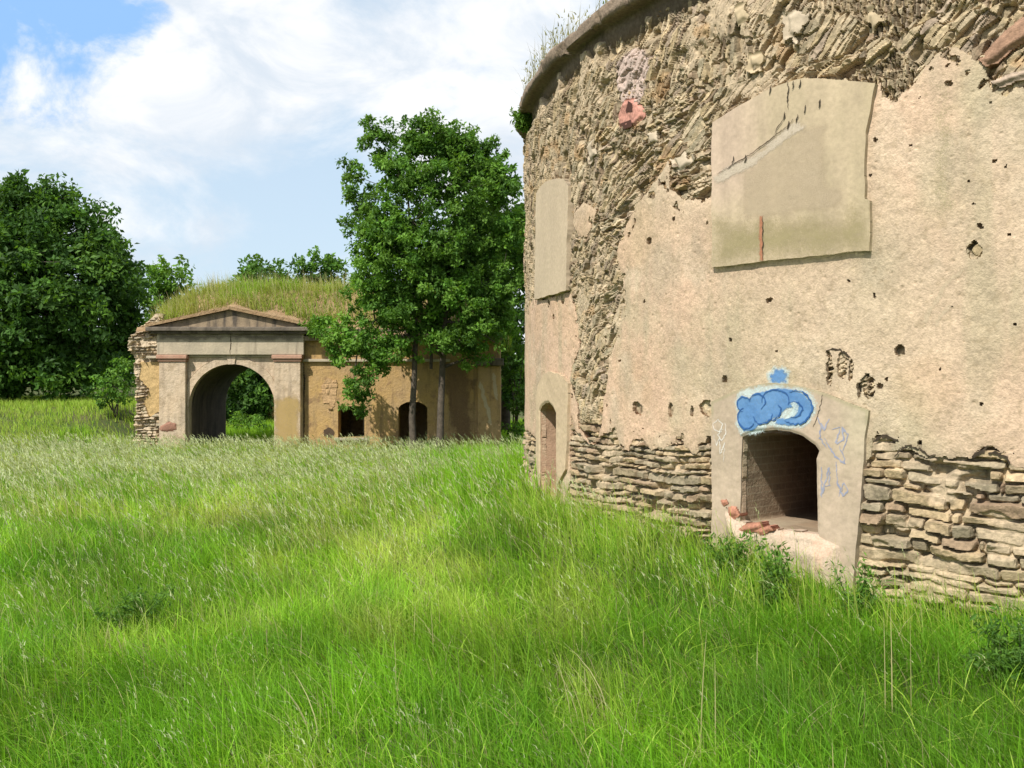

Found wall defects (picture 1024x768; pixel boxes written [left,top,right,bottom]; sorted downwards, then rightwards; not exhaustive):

spalling [522,0,1024,543]
spalling [858,435,1024,620]